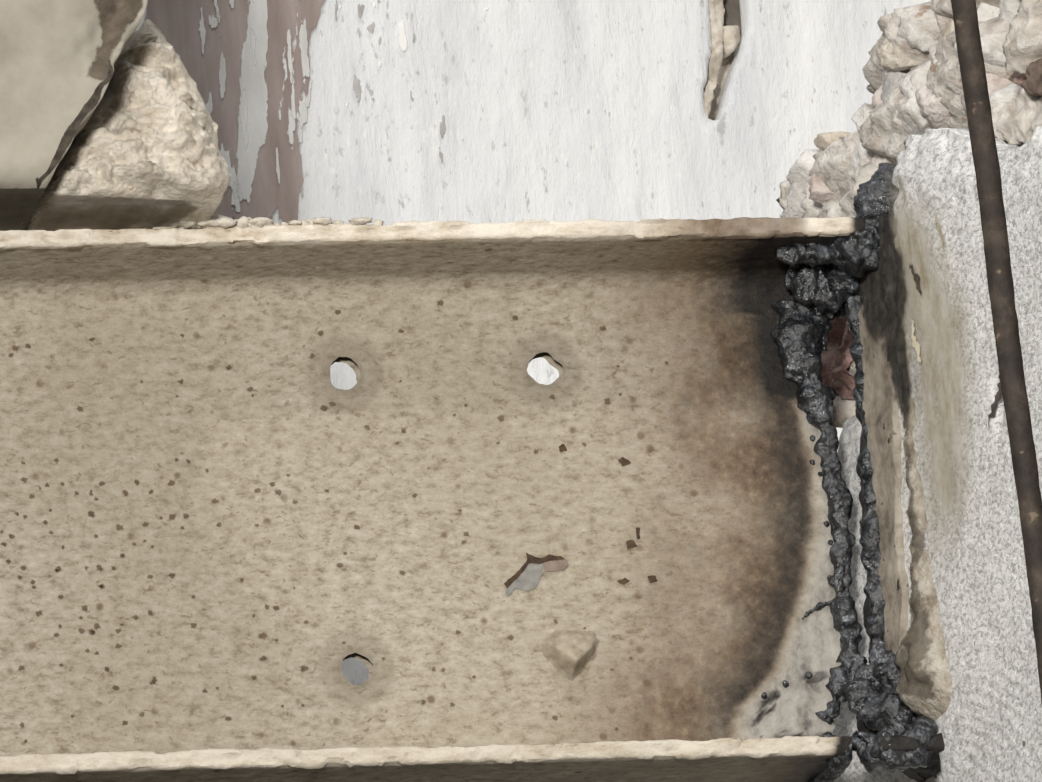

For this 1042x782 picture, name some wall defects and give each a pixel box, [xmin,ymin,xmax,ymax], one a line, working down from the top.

flaking render [776,0,969,218]
spalling [976,0,1042,147]
flaking render [820,316,856,428]
peeling [504,553,568,596]